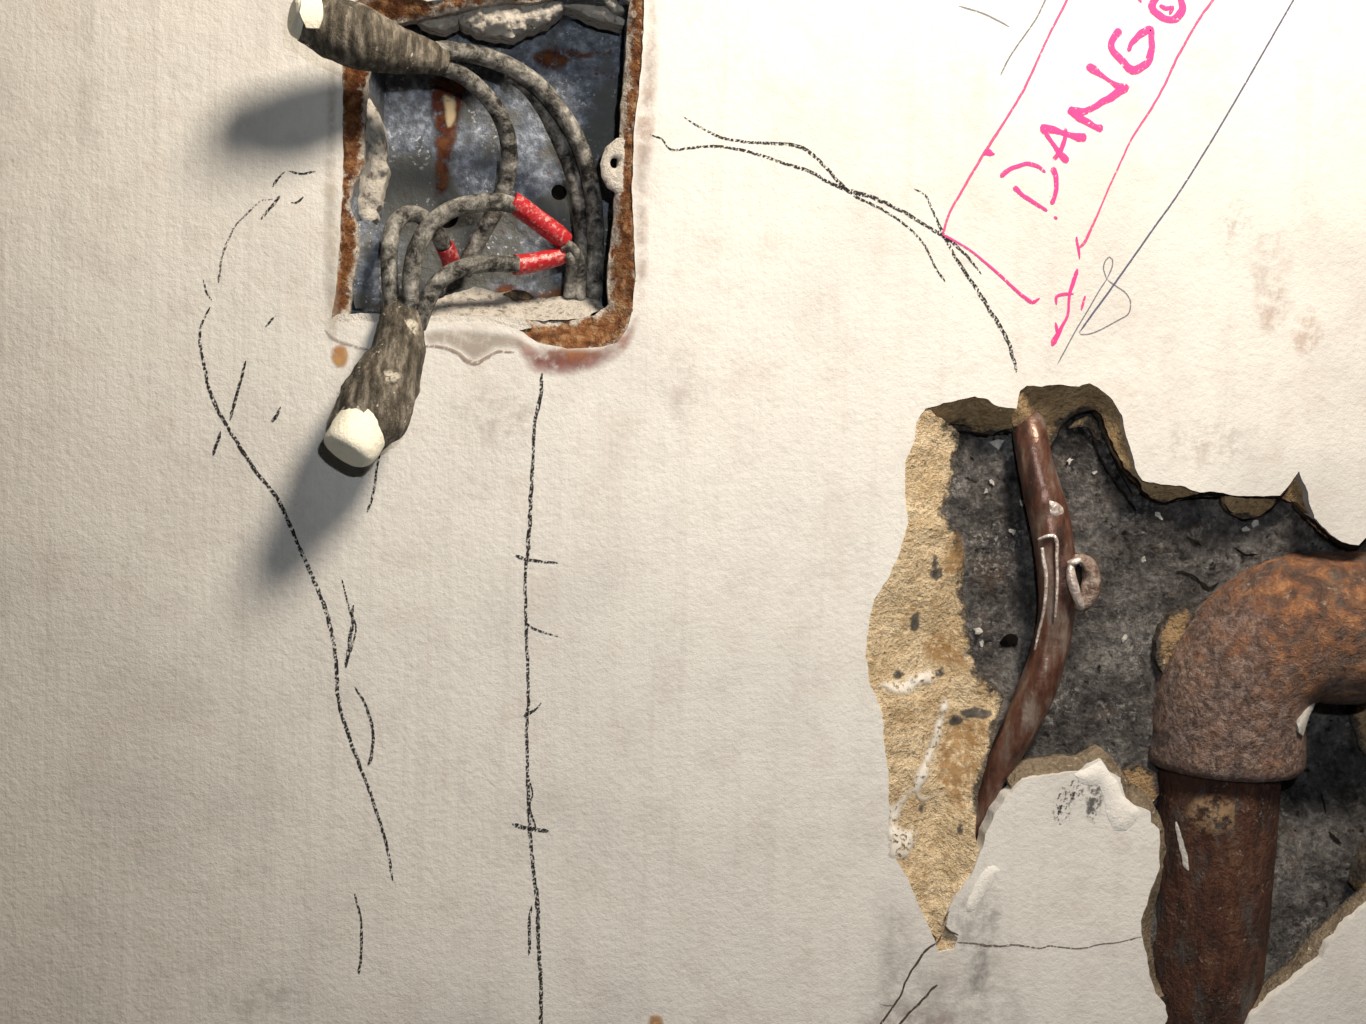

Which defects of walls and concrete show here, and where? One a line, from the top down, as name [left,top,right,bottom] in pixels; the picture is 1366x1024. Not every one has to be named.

flaking render [865,383,1366,1009]